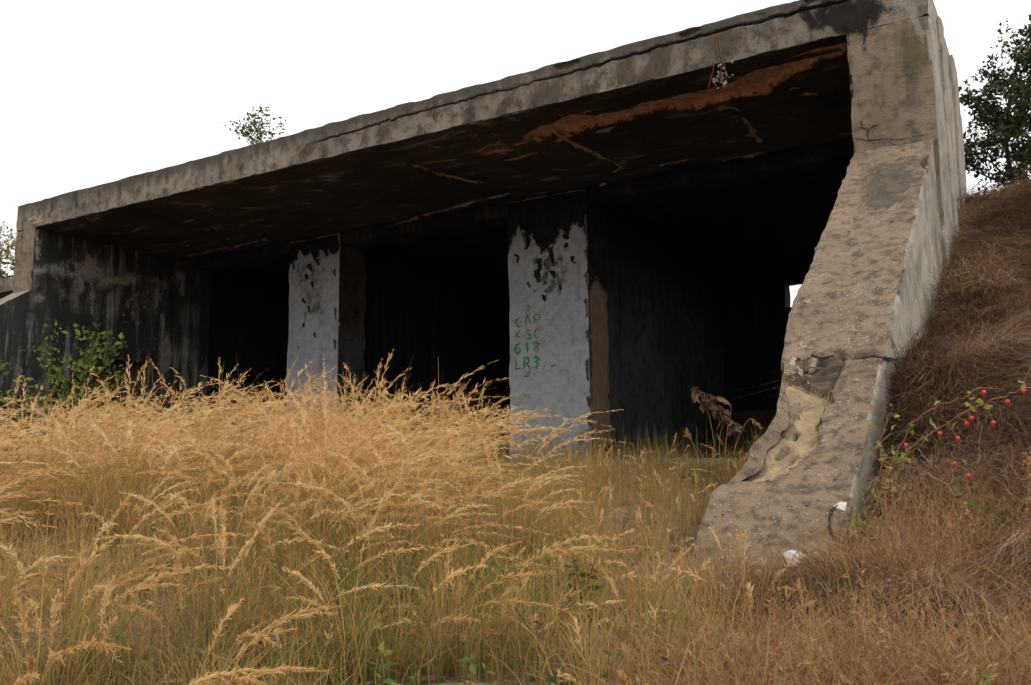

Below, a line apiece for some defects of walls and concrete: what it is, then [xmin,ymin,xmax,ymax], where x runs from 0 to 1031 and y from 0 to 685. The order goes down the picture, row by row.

water stain [799,0,921,50]
crack [319,0,849,142]
crack [856,121,929,145]
peeling [301,259,319,338]
peeling [527,234,611,460]
crack [782,354,908,377]
spalling [732,342,845,484]